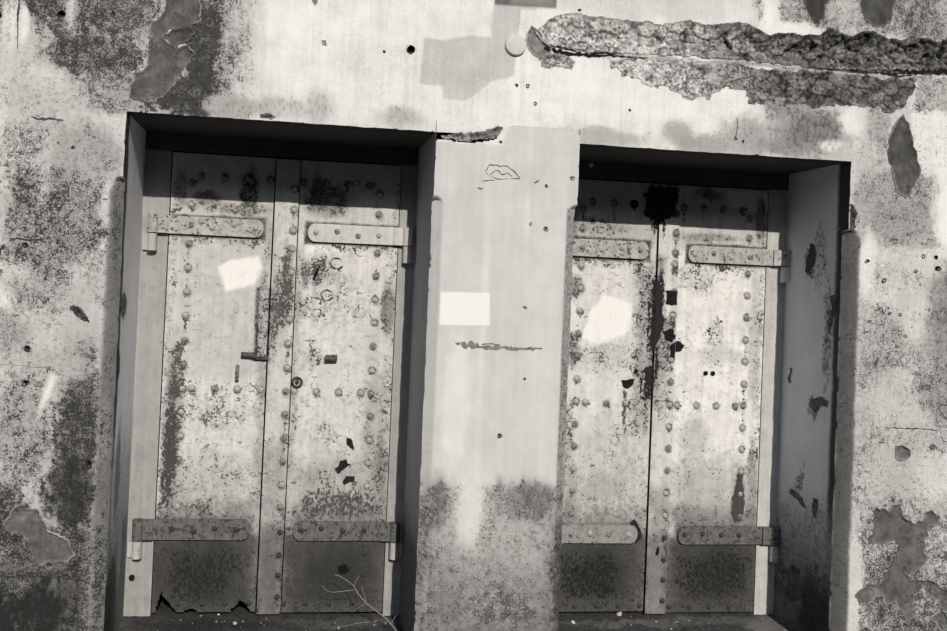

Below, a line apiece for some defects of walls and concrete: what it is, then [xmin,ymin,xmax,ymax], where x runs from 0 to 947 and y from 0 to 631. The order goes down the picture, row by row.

peeling [129,0,202,103]
spalling [441,125,503,142]
spalling [525,0,947,198]
rust [630,182,679,243]
rust [621,267,684,433]
damp [0,576,68,631]
peeling [2,507,75,566]
rust [157,404,179,508]
rust [731,470,745,522]
peeling [855,502,947,631]